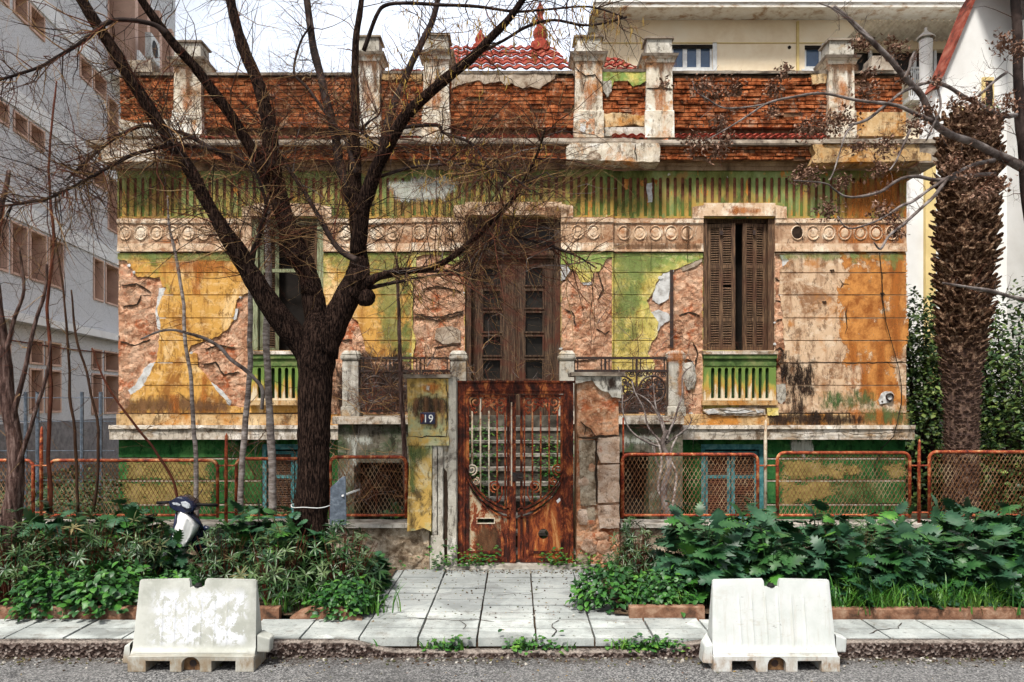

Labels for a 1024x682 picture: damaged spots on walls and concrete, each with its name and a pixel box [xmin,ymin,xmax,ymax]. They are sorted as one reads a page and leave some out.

peeling [389,176,457,202]
flaking render [117,259,173,412]
flaking render [190,293,252,407]
flaking render [559,258,612,370]
flaking render [618,258,765,416]
water stain [769,350,863,425]